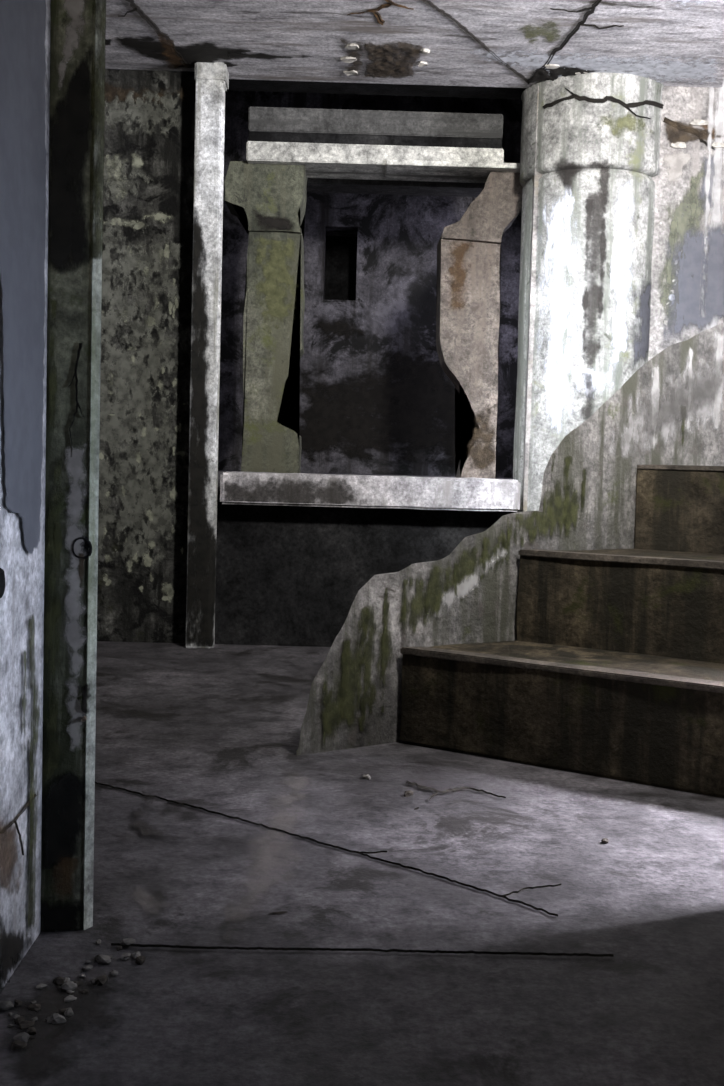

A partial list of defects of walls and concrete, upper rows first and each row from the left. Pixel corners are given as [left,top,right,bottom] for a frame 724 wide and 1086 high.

spalling [341,42,430,78]
crack [347,0,724,151]
damp [48,51,217,647]
damp [256,214,293,231]
damp [362,276,415,331]
damp [556,159,610,419]
damp [611,78,724,455]
peeling [663,226,724,340]
spalling [664,118,724,213]
damp [224,478,364,506]
damp [341,607,369,718]
damp [381,530,509,712]